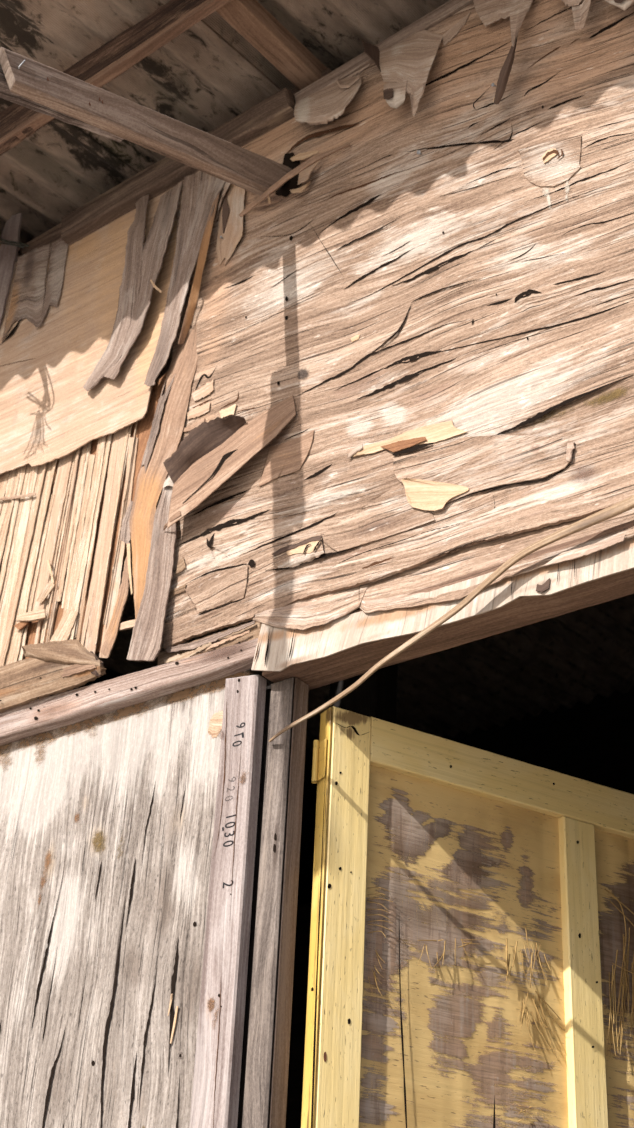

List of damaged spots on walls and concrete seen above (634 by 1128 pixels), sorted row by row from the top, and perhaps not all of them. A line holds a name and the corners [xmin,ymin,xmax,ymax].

peeling [294,64,370,125]
peeling [144,171,230,386]
crack [192,3,634,412]
crack [497,375,632,435]
spalling [0,422,138,666]
crack [179,463,570,583]
peeling [536,534,626,592]
crack [213,702,241,911]
crack [31,786,180,1128]
crack [399,921,407,1128]
peeling [359,789,562,1128]
peeling [598,862,634,1073]